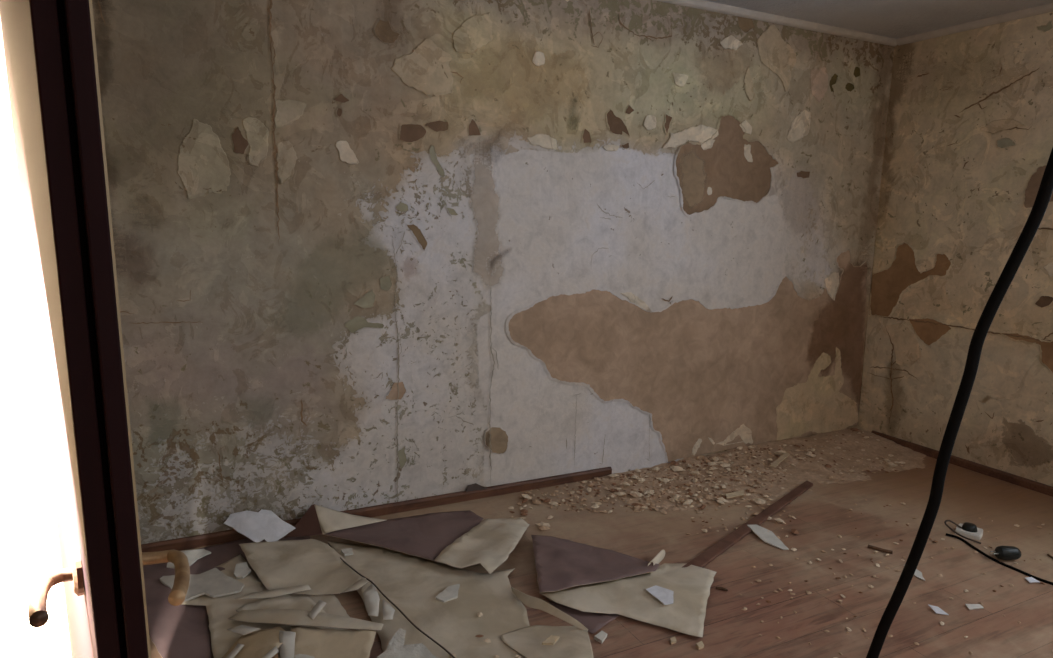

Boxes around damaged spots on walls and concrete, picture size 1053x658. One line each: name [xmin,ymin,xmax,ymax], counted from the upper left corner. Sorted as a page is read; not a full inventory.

crack [267,0,280,241]
crack [948,67,1039,168]
peeling [335,140,359,164]
spalling [398,119,450,177]
flaking render [581,104,779,217]
flaking render [1023,165,1046,209]
spalling [395,201,428,251]
spalling [1033,295,1053,308]
flaking render [505,242,953,463]
flaking render [999,330,1053,375]
spalling [484,426,510,454]
flaking render [223,509,296,542]